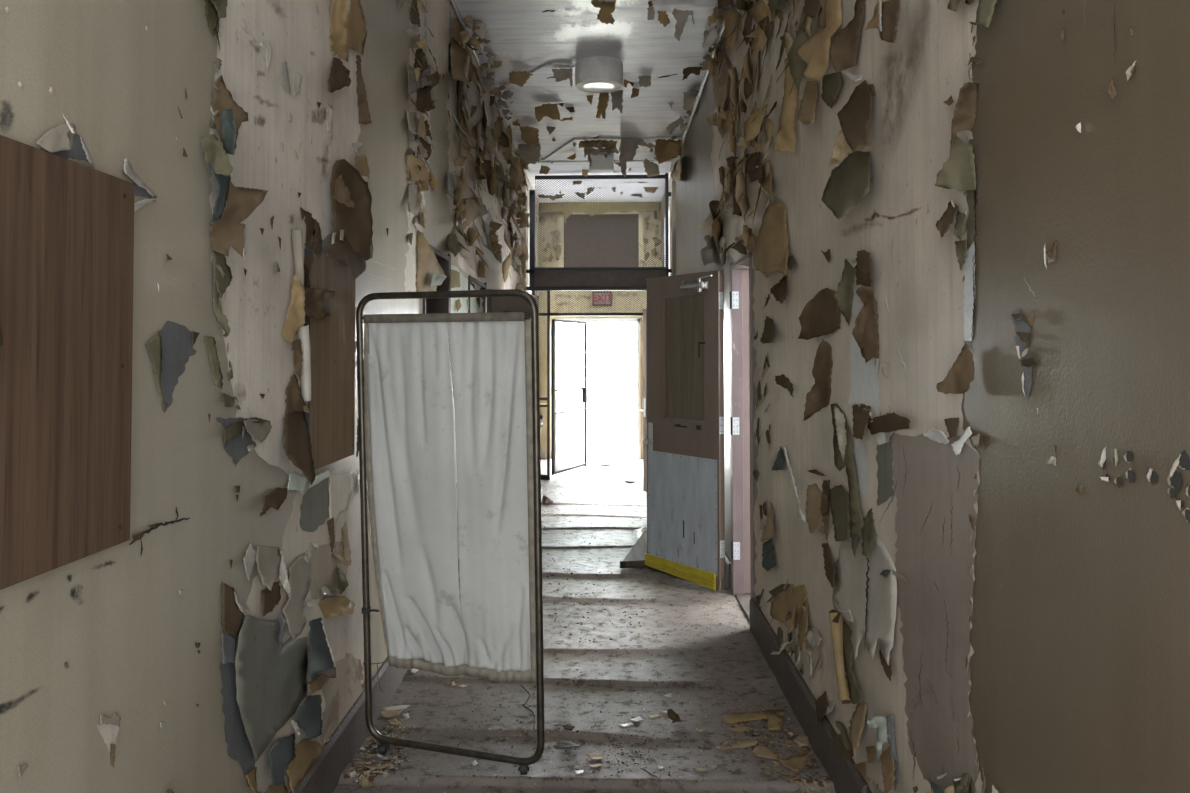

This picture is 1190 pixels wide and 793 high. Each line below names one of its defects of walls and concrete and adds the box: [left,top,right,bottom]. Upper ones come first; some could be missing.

crack [129,507,189,555]
peeling [145,0,389,793]
peeling [404,0,1007,793]
peeling [1011,308,1039,416]